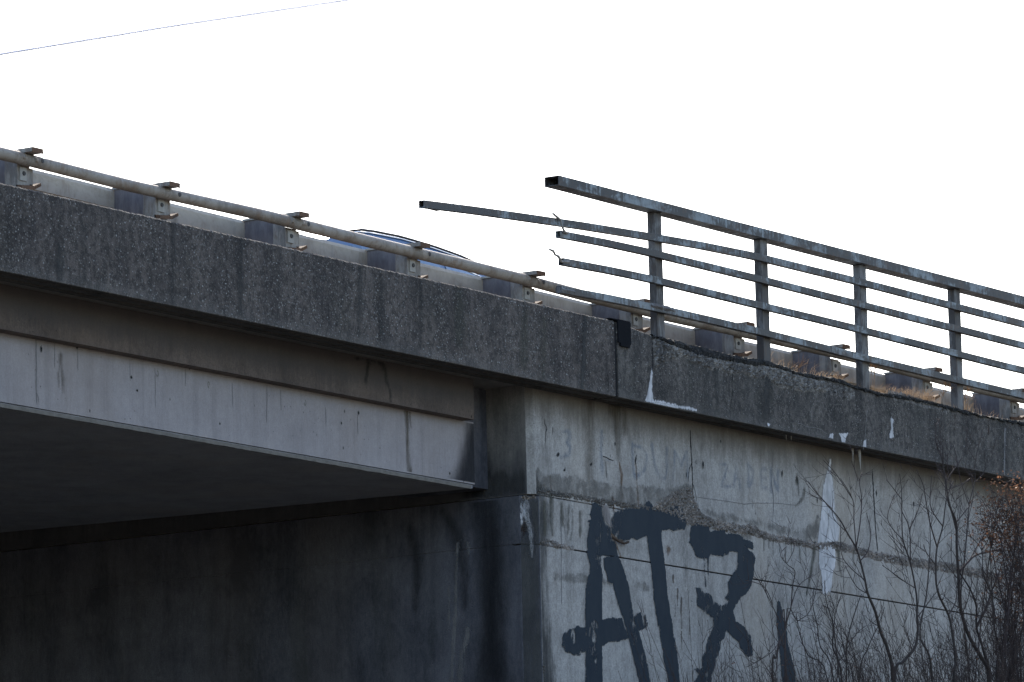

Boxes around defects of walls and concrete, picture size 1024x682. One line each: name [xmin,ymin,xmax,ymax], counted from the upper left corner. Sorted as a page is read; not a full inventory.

spalling [652,335,855,399]
spalling [521,459,1003,582]